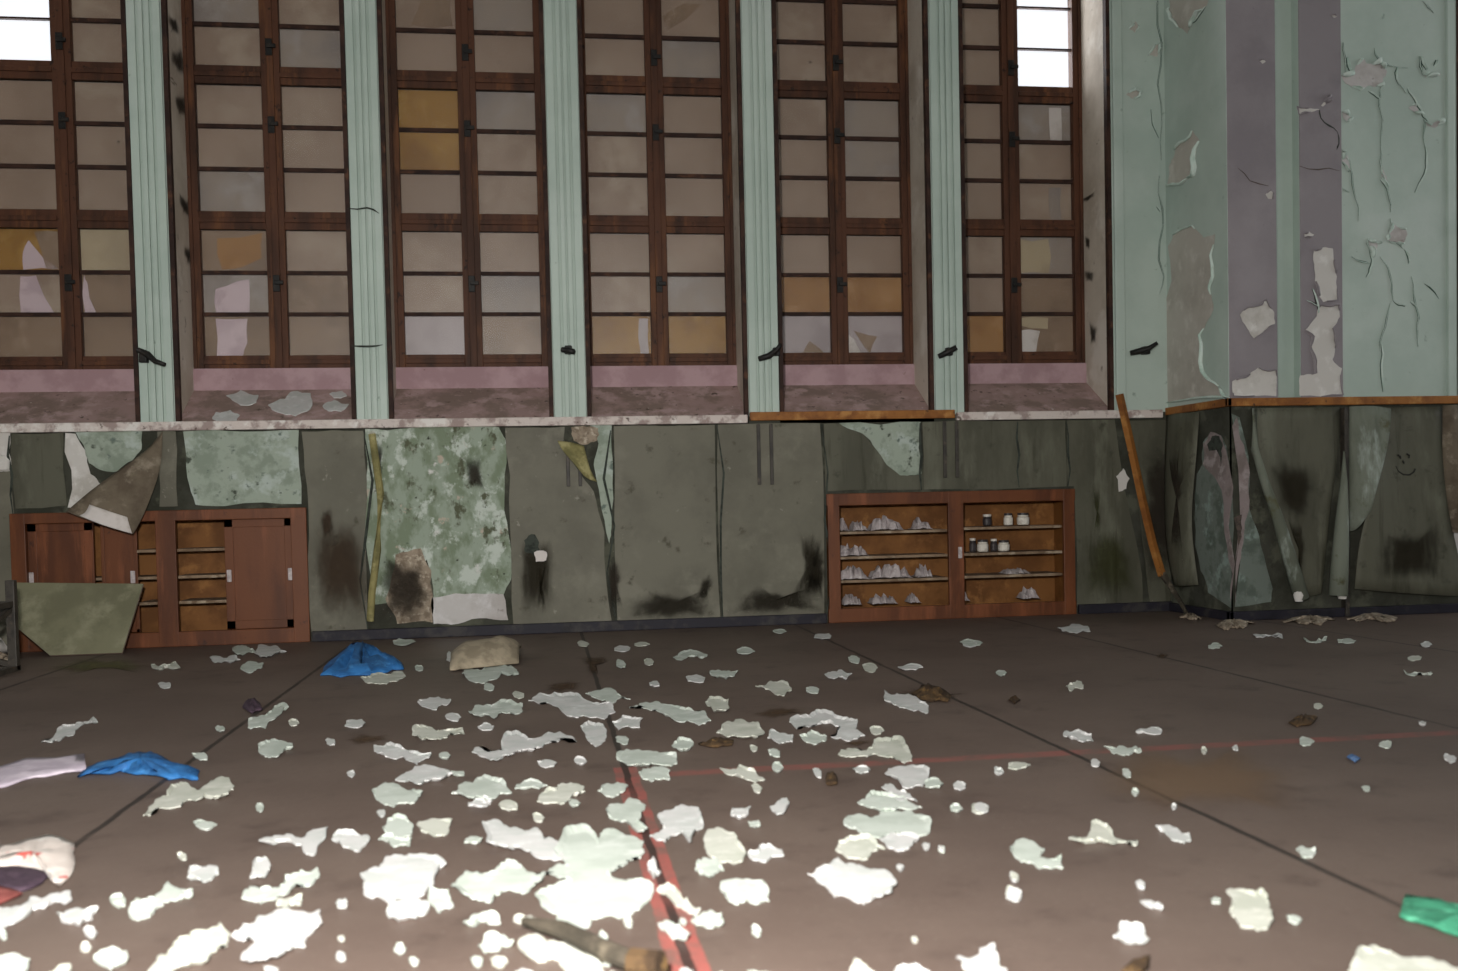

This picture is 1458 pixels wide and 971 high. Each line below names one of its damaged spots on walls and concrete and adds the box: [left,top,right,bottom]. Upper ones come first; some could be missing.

crack [1300,42,1439,392]
peeling [1299,231,1344,397]
flaking render [0,433,11,472]
flaking render [65,431,142,508]
flaking render [840,422,920,476]
flaking render [1166,225,1277,608]
damp [320,513,359,599]
flaking render [365,427,512,625]
spalling [534,550,547,562]
damp [642,580,710,616]
damp [745,544,823,610]
damp [1387,535,1434,573]